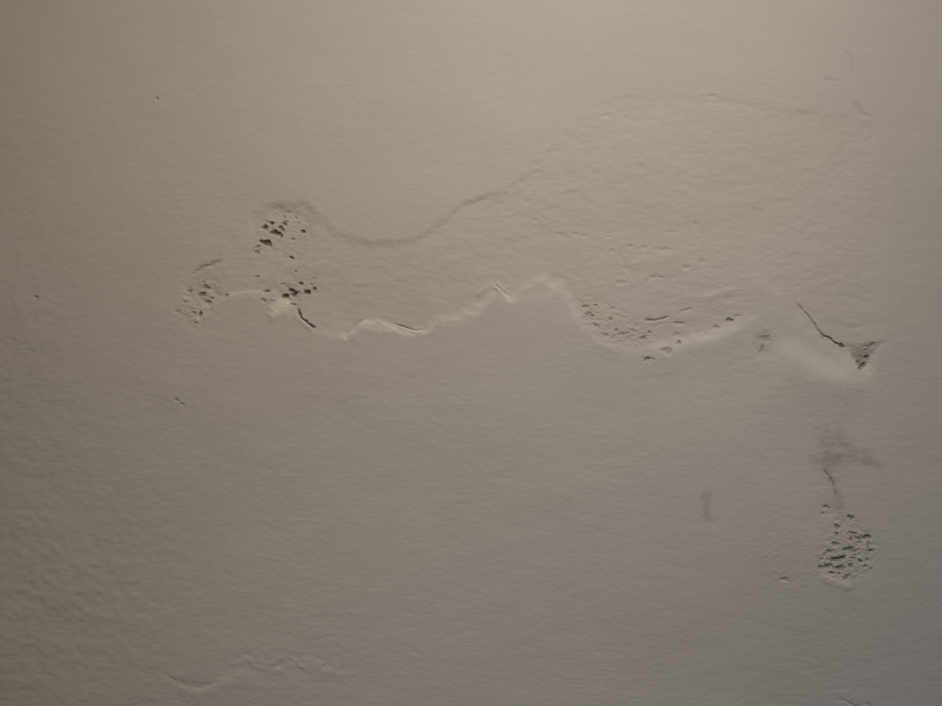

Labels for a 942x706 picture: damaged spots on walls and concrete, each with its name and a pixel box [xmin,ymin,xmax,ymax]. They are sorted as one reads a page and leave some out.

flaking render [236,192,326,267]
crack [782,290,857,357]